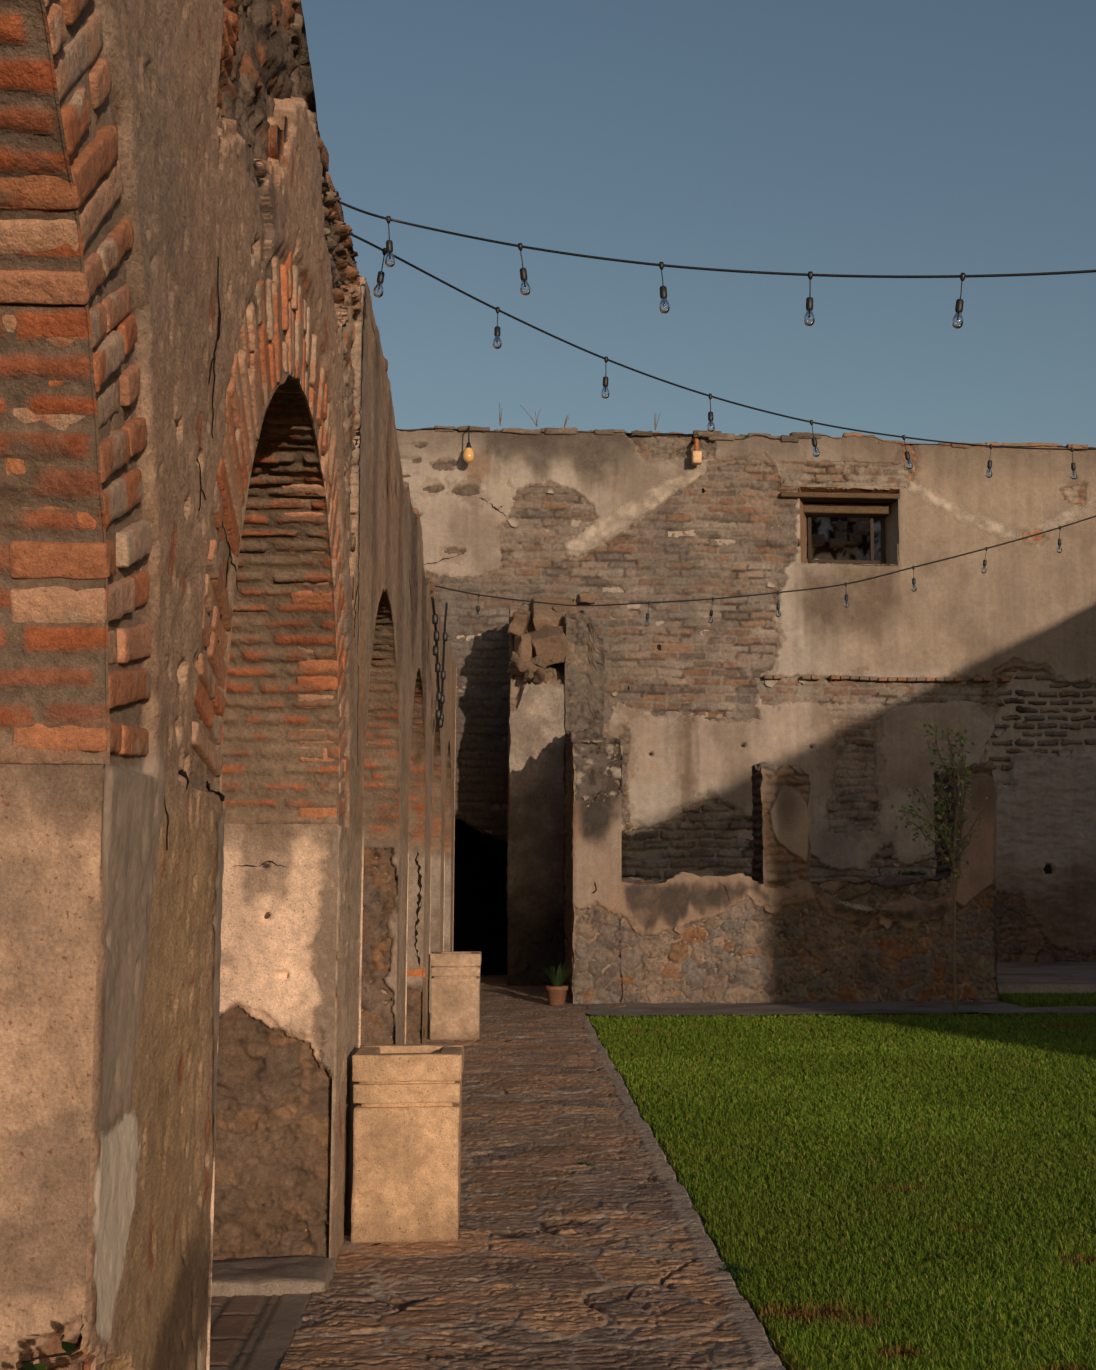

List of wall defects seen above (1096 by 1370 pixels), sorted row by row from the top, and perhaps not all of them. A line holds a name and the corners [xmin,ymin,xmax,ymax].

flaking render [217,0,324,254]
crack [196,257,238,644]
flaking render [321,176,361,600]
flaking render [424,434,1096,880]
flaking render [572,845,998,1004]
flaking render [212,1006,332,1260]